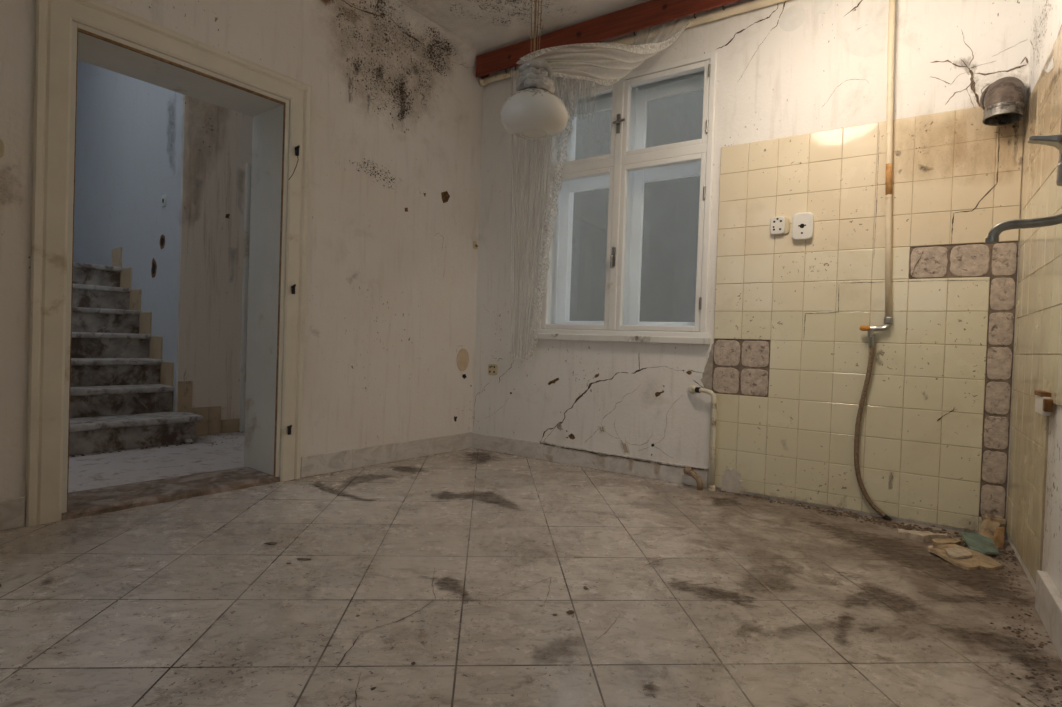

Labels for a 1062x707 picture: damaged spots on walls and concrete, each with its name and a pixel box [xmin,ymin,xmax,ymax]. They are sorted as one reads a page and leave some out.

damp [322,0,456,133]
crack [930,29,1034,106]
crack [951,138,1000,244]
crack [804,252,923,332]
crack [542,362,704,458]